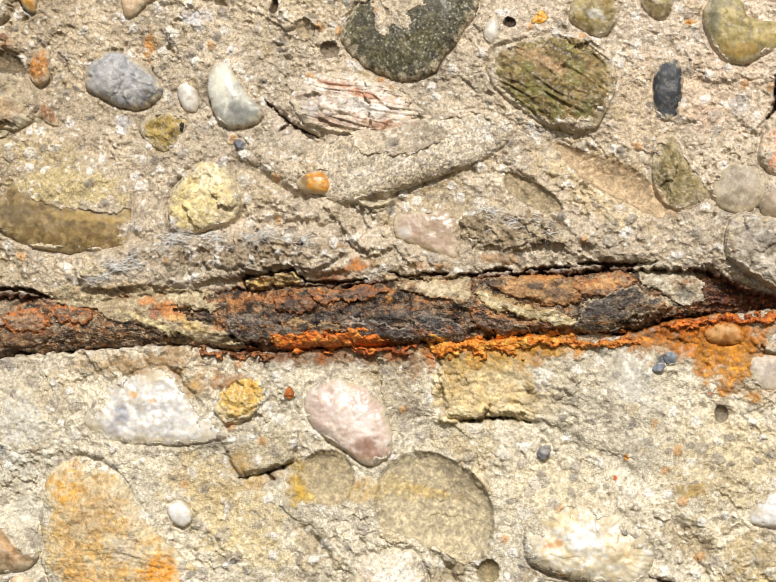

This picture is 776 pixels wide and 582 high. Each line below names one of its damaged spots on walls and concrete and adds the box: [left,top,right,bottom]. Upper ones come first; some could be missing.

crack [767,76,776,119]
crack [0,287,50,299]
crack [243,267,368,289]
rust [322,258,367,279]
crack [392,260,656,280]
spalling [0,259,776,424]
rust [440,335,567,414]
rust [627,313,776,397]